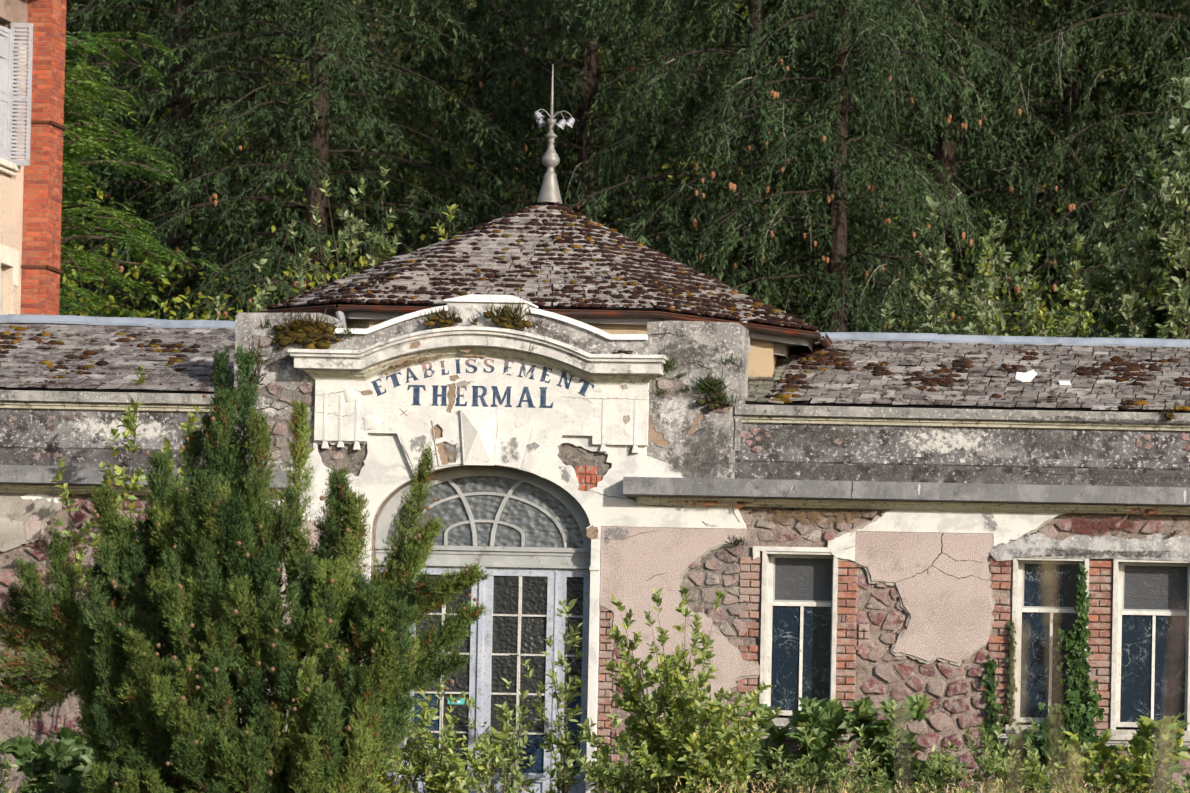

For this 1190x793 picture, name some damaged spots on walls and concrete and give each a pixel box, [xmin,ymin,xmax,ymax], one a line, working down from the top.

water stain [68,417,169,441]
flaking render [432,424,458,465]
spalling [557,443,612,491]
water stain [752,428,873,448]
water stain [762,464,901,489]
water stain [900,416,1190,454]
spalling [0,493,110,607]
crack [896,534,988,582]
spalling [1038,514,1164,539]
spalling [681,507,877,664]
spalling [597,607,645,769]
spalling [831,559,1011,793]